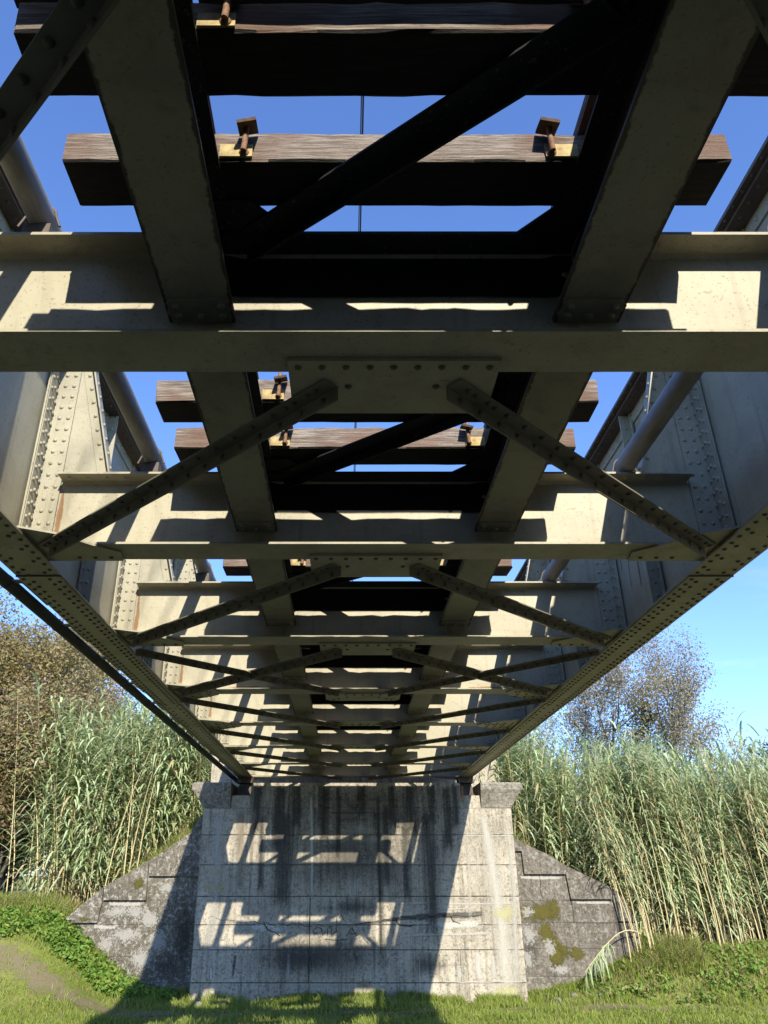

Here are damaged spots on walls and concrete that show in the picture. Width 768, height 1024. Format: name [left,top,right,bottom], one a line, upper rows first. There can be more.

crack [210,908,482,981]
water stain [238,786,559,993]
water stain [577,883,625,941]